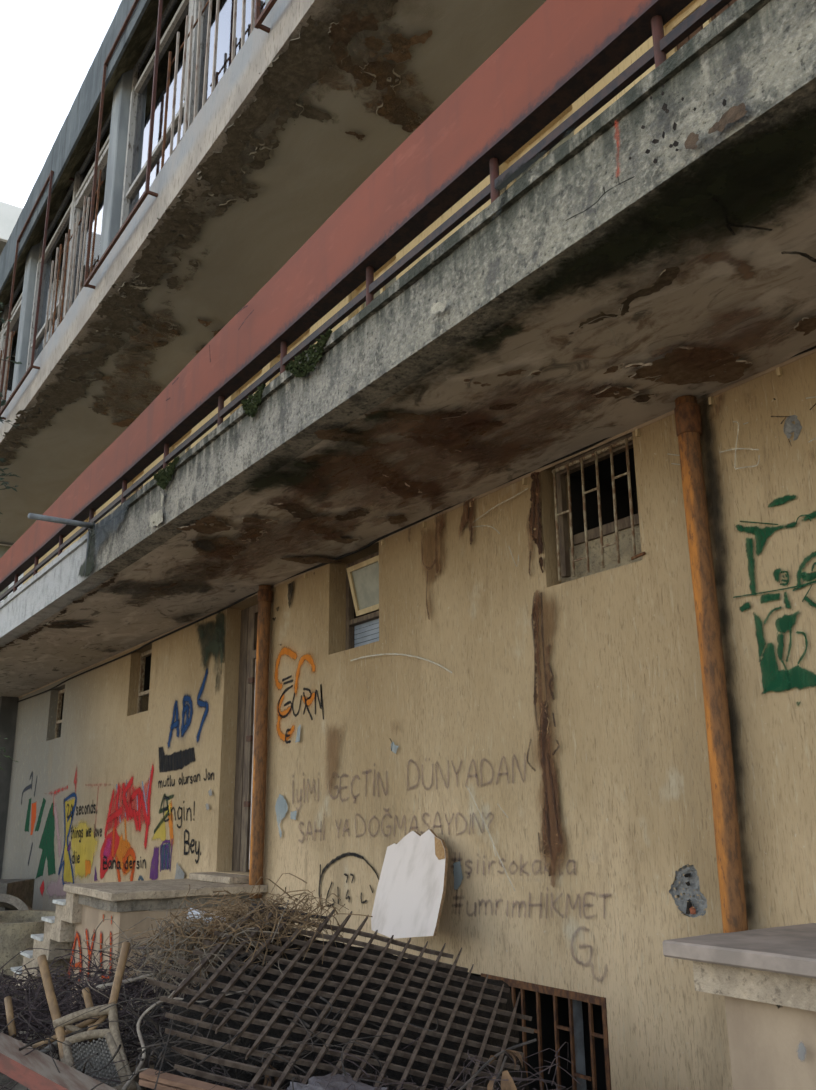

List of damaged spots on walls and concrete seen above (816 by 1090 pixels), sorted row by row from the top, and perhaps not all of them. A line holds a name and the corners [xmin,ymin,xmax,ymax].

peeling [0,0,433,466]
peeling [431,300,446,314]
water stain [93,110,816,621]
water stain [79,498,129,577]
water stain [173,613,225,689]
rust [527,591,566,887]
flaking render [669,864,707,918]